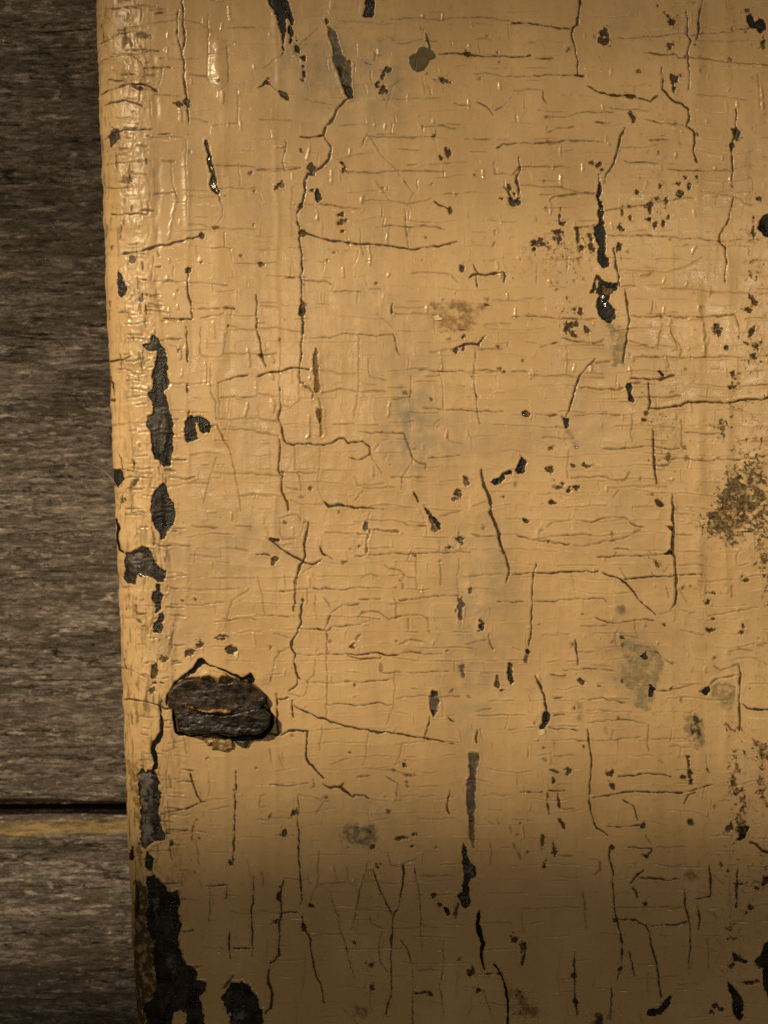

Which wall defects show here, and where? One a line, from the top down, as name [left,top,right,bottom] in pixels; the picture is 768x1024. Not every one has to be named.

crack [103,5,190,182]
crack [511,0,703,175]
peeling [531,161,631,323]
crack [706,110,741,276]
peeling [143,335,223,467]
peeling [123,546,166,633]
peeling [150,483,175,539]
rust [187,706,231,714]
crack [123,99,509,1024]
crack [481,248,768,1013]
water stain [700,404,768,592]
peeling [127,760,206,1024]